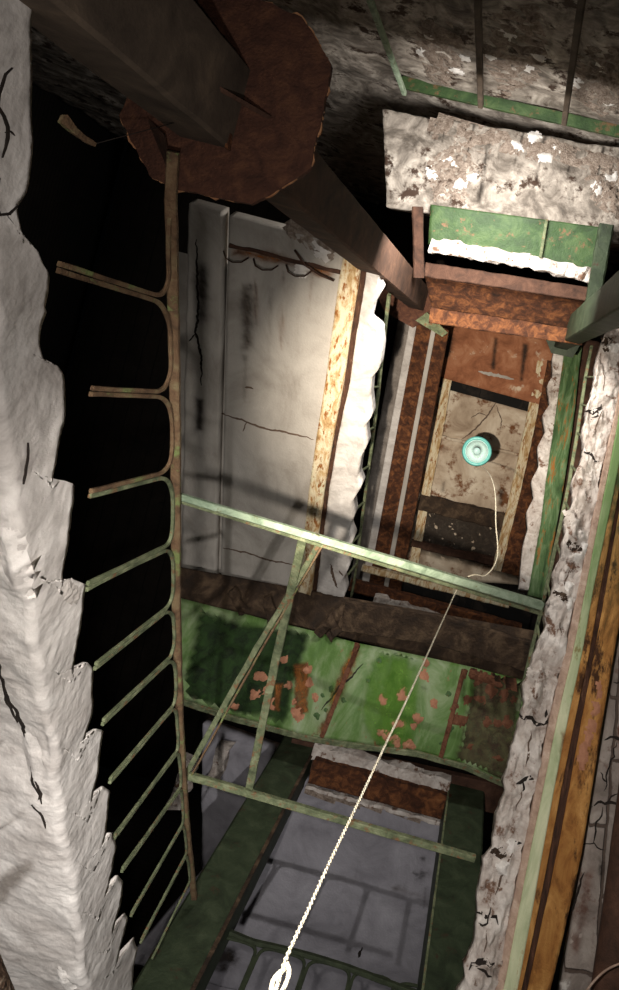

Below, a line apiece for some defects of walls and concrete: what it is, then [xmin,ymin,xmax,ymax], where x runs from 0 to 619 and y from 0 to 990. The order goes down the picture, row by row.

crack [0,67,15,180]
crack [0,206,18,216]
crack [221,413,314,440]
crack [0,664,26,738]
rust [294,663,309,714]
peeling [378,687,407,706]
peeling [377,713,424,750]
peeling [430,668,518,732]
rust [458,675,521,778]
crack [30,766,46,829]
crack [583,736,619,850]
spalling [490,838,520,876]